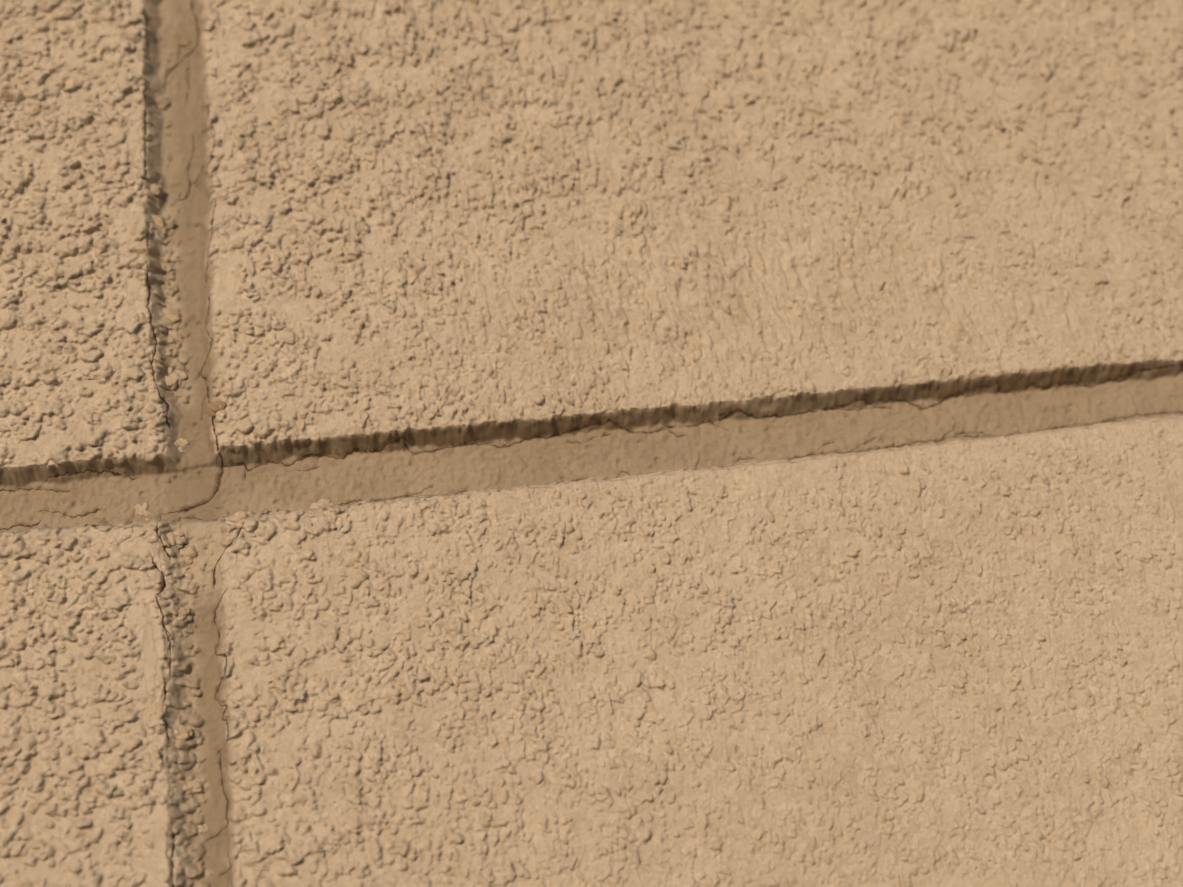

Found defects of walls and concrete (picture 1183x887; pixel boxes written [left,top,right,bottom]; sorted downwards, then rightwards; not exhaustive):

crack [143,0,215,201]
crack [131,224,170,430]
crack [0,467,141,531]
crack [150,200,1183,887]